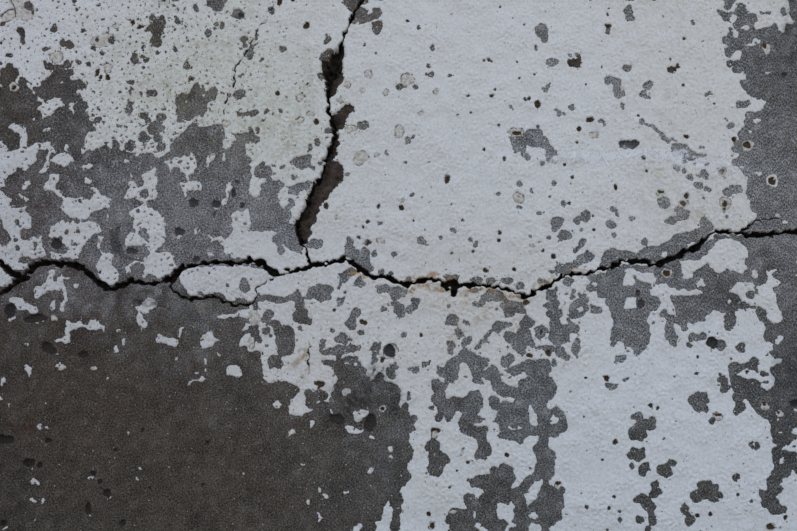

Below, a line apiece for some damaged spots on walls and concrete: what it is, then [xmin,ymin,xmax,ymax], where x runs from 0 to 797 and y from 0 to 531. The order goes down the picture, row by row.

peeling [0,0,34,45]
peeling [59,38,75,49]
peeling [91,35,115,56]
peeling [130,14,183,66]
peeling [192,0,245,38]
peeling [239,28,264,62]
peeling [319,34,334,62]
peeling [341,0,383,35]
crack [0,0,797,307]
peeling [407,0,797,531]
peeling [0,47,420,531]